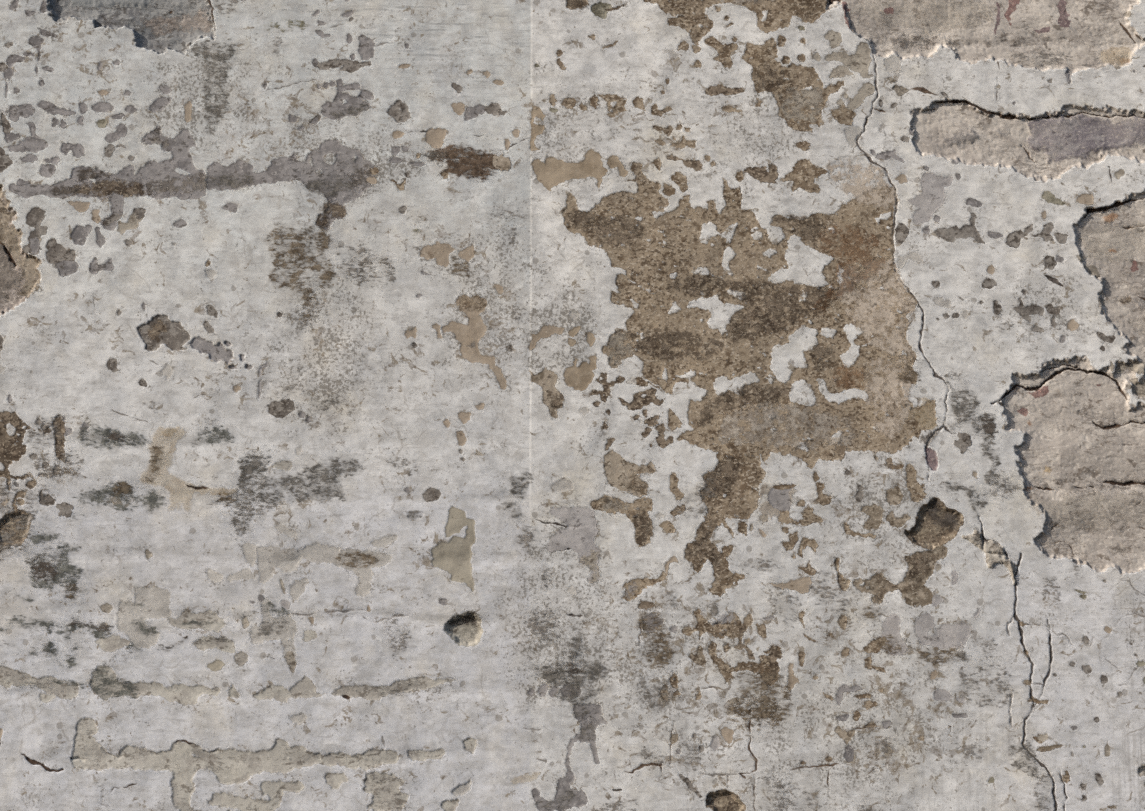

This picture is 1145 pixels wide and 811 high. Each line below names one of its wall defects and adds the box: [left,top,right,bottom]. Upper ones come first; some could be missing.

peeling [451,69,507,121]
crack [0,242,17,267]
crack [851,30,1145,480]
peeling [137,302,311,423]
peeling [505,0,1145,690]
peeling [0,394,89,547]
peeling [431,507,476,592]
crack [1035,481,1145,529]
peeling [0,666,239,706]
peeling [95,523,455,703]
flaking render [438,598,483,647]
crack [979,519,1070,811]